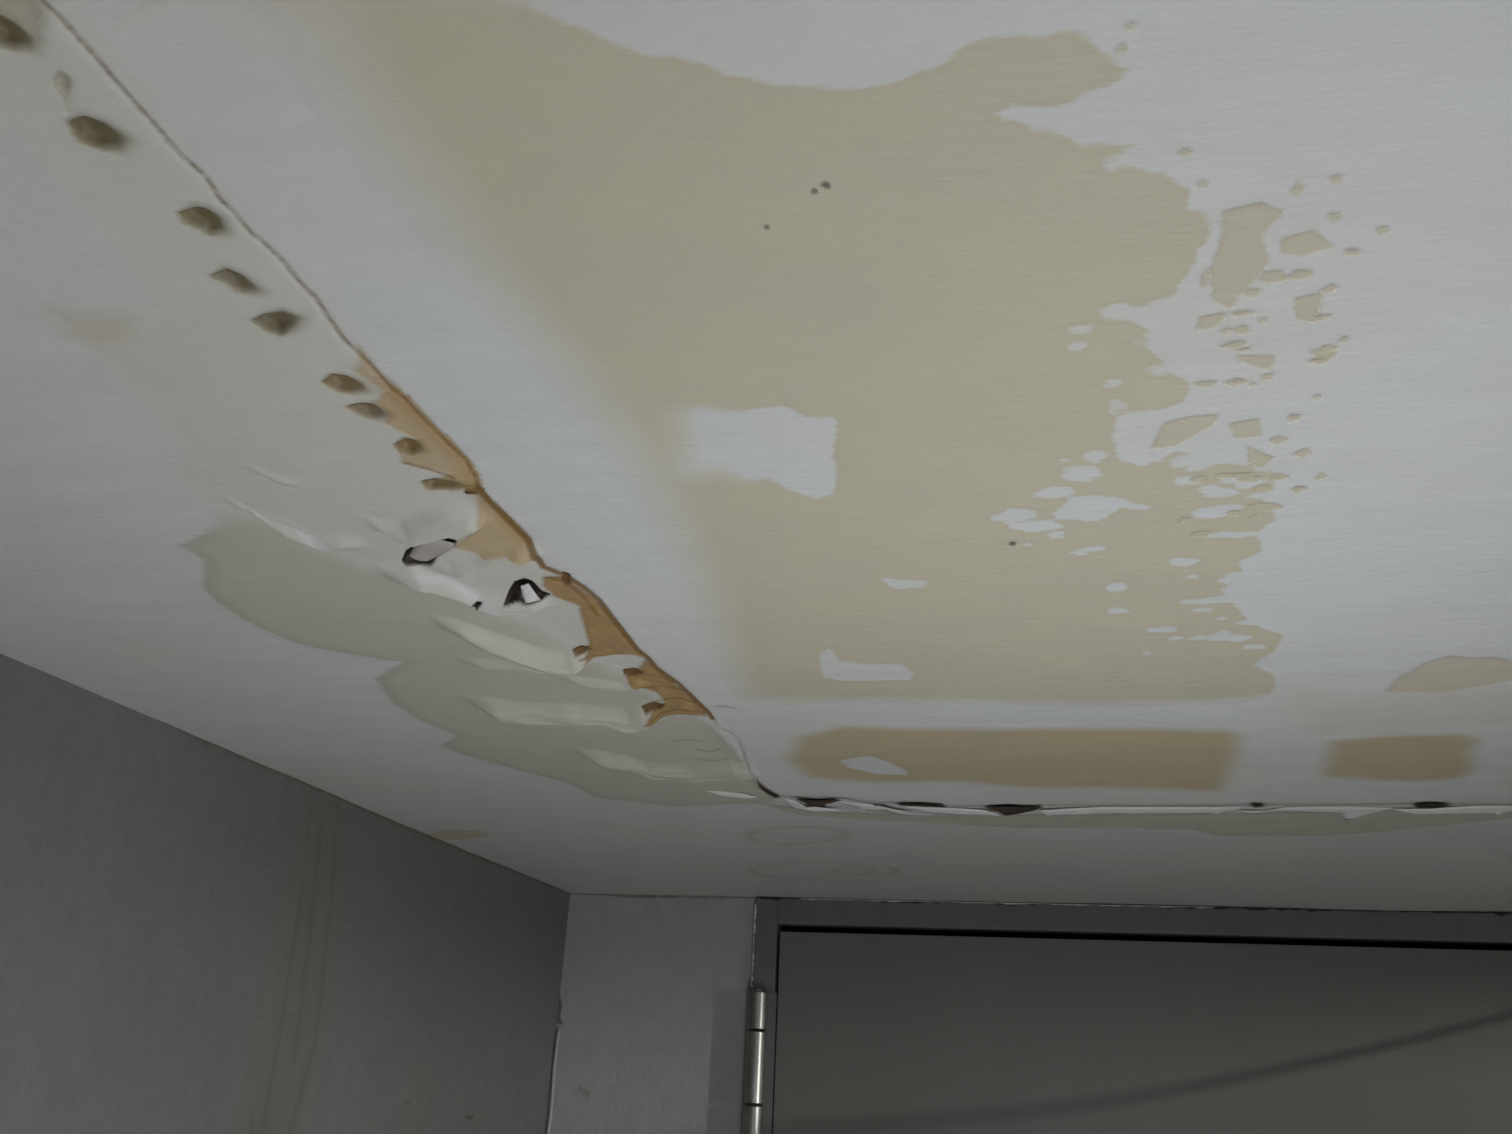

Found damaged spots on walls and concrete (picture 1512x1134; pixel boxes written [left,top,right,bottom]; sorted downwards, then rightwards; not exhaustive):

crack [190,162,406,398]
hole [323,374,383,418]
water stain [0,0,1512,836]
hole [395,438,422,455]
hole [422,478,463,490]
spalling [402,547,436,566]
hole [504,578,550,606]
crack [445,439,715,720]
peeling [705,791,756,799]
crack [758,782,947,808]
crack [984,806,1042,816]
crack [1412,802,1451,810]